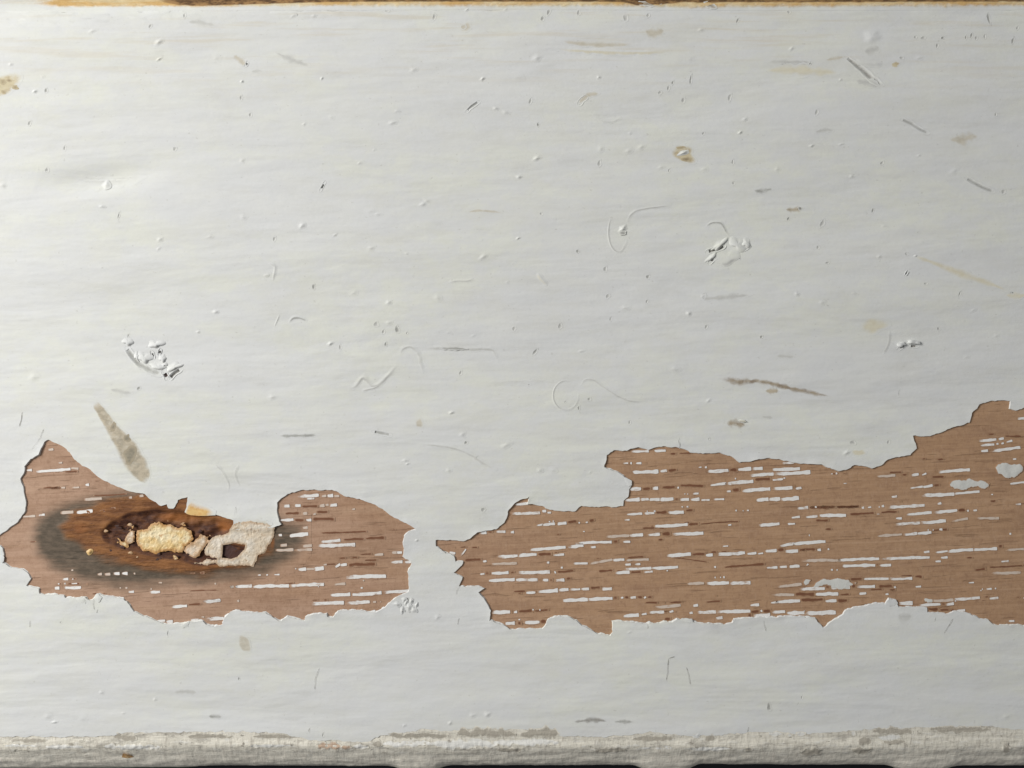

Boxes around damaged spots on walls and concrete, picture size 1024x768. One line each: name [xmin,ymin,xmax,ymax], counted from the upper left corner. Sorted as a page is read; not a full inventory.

peeling [0,440,418,628]
peeling [436,401,1024,635]